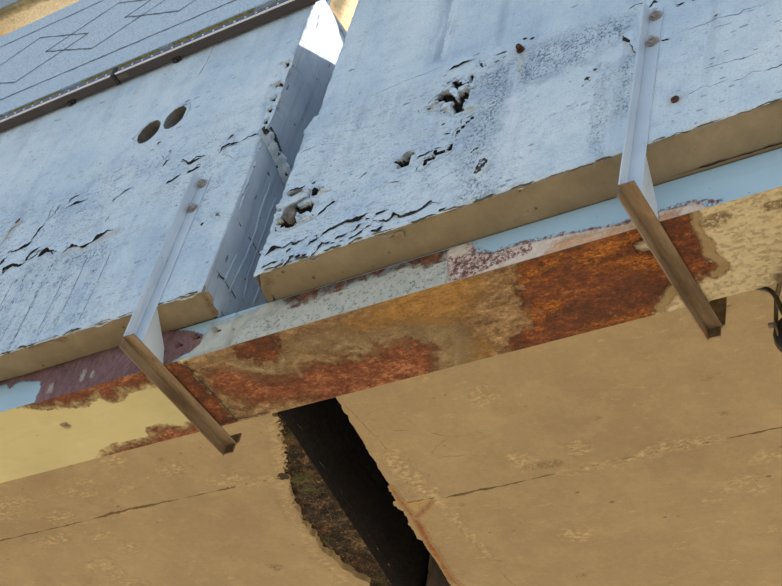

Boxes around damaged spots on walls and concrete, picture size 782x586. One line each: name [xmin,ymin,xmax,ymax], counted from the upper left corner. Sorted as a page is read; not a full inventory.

crack [622,0,694,53]
crack [159,127,261,184]
spalling [258,7,641,270]
crack [0,167,133,276]
corrosion [658,199,732,282]
corrosion [763,200,782,211]
peeling [0,346,142,403]
peeling [162,330,203,365]
corrosion [164,220,677,426]
crack [0,473,289,541]
corrosion [388,485,464,586]
crack [343,403,554,586]